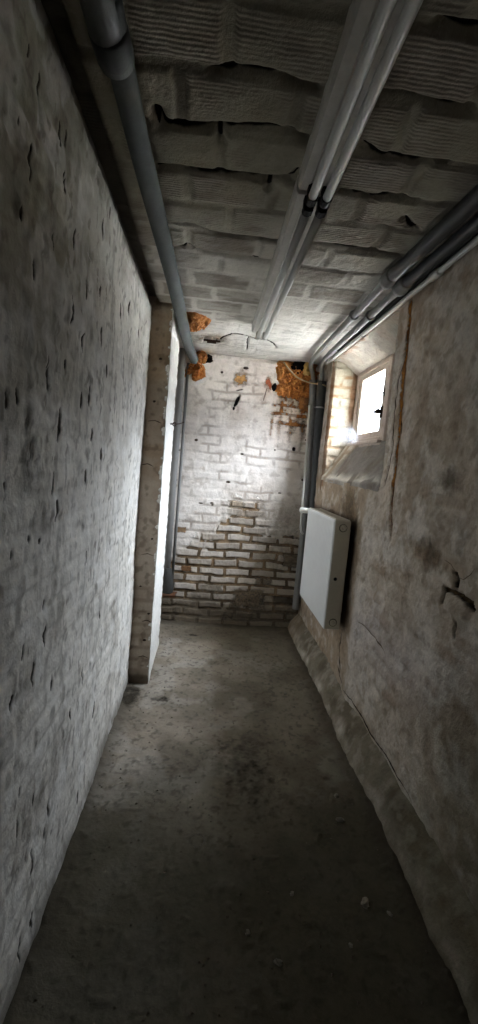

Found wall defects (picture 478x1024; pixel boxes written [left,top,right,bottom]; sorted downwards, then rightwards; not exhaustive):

spalling [162,481,301,614]
spalling [443,560,476,612]
crack [337,622,409,795]